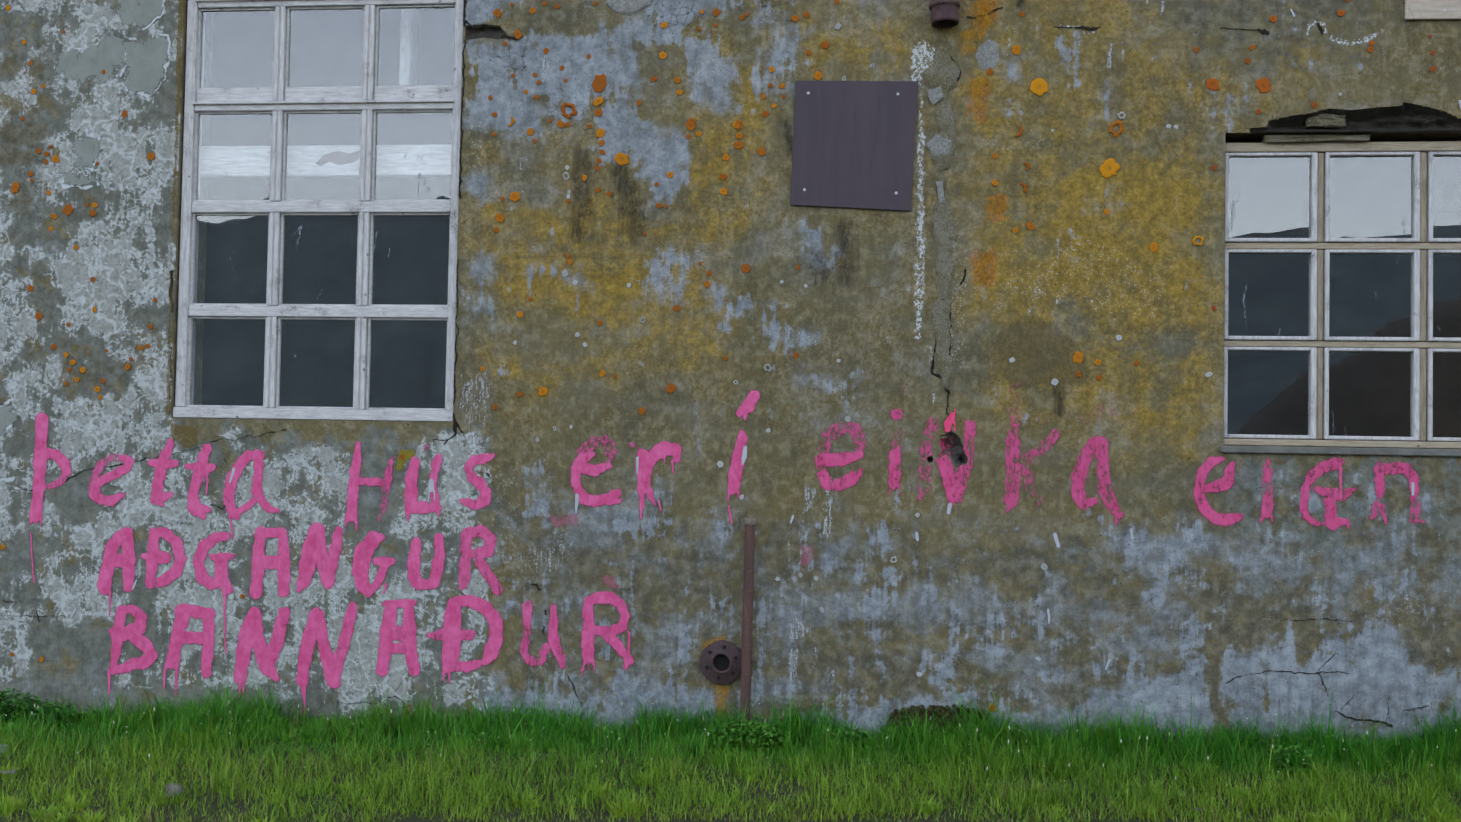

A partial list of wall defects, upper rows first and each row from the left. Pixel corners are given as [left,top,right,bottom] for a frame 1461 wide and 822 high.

peeling [54,0,171,102]
peeling [56,127,103,190]
damp [910,40,935,363]
crack [931,269,966,459]